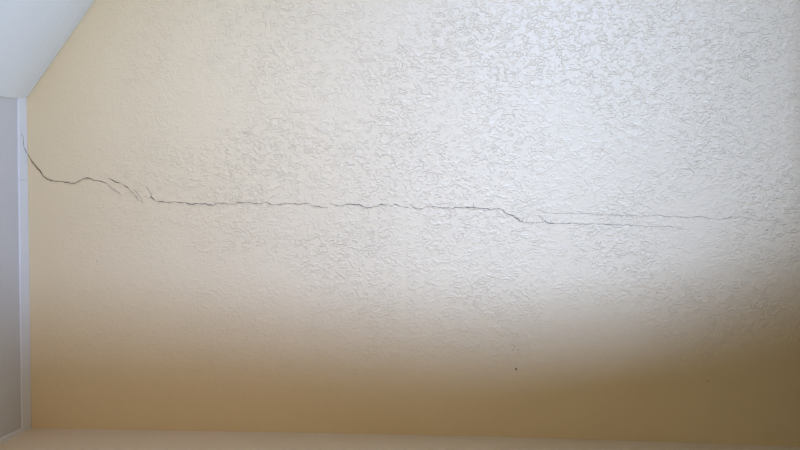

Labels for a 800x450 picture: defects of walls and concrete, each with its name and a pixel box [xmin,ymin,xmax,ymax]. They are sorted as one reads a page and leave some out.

crack [21,134,782,230]